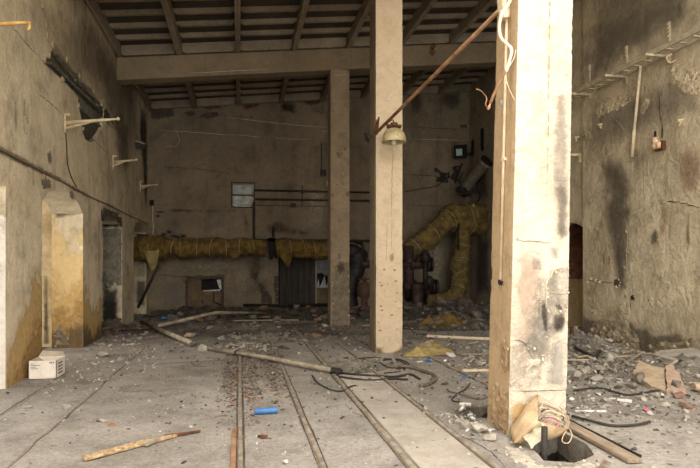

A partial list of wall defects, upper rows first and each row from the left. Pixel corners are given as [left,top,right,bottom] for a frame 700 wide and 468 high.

flaking render [43,42,114,145]
flaking render [668,64,700,99]
peeling [101,207,123,288]
leakage [609,202,625,280]
leakage [0,215,116,389]